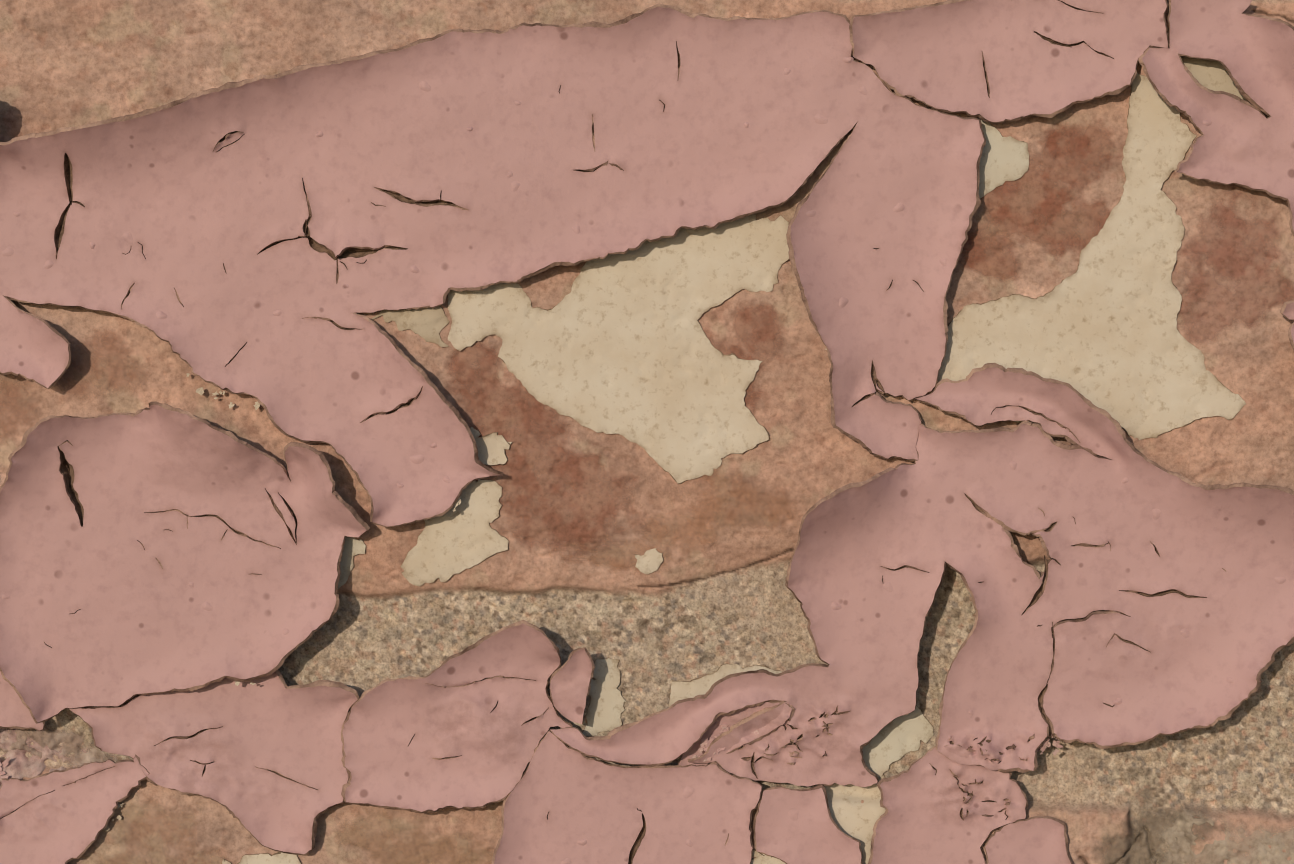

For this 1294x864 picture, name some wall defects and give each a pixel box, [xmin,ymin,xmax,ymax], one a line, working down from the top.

peeling [849,0,1294,255]
crack [55,153,84,254]
crack [261,178,408,274]
crack [371,189,456,206]
peeling [0,4,1016,552]
spalling [1171,202,1294,350]
crack [58,446,84,526]
crack [154,492,297,549]
peeling [0,363,1294,864]
crack [628,808,646,864]